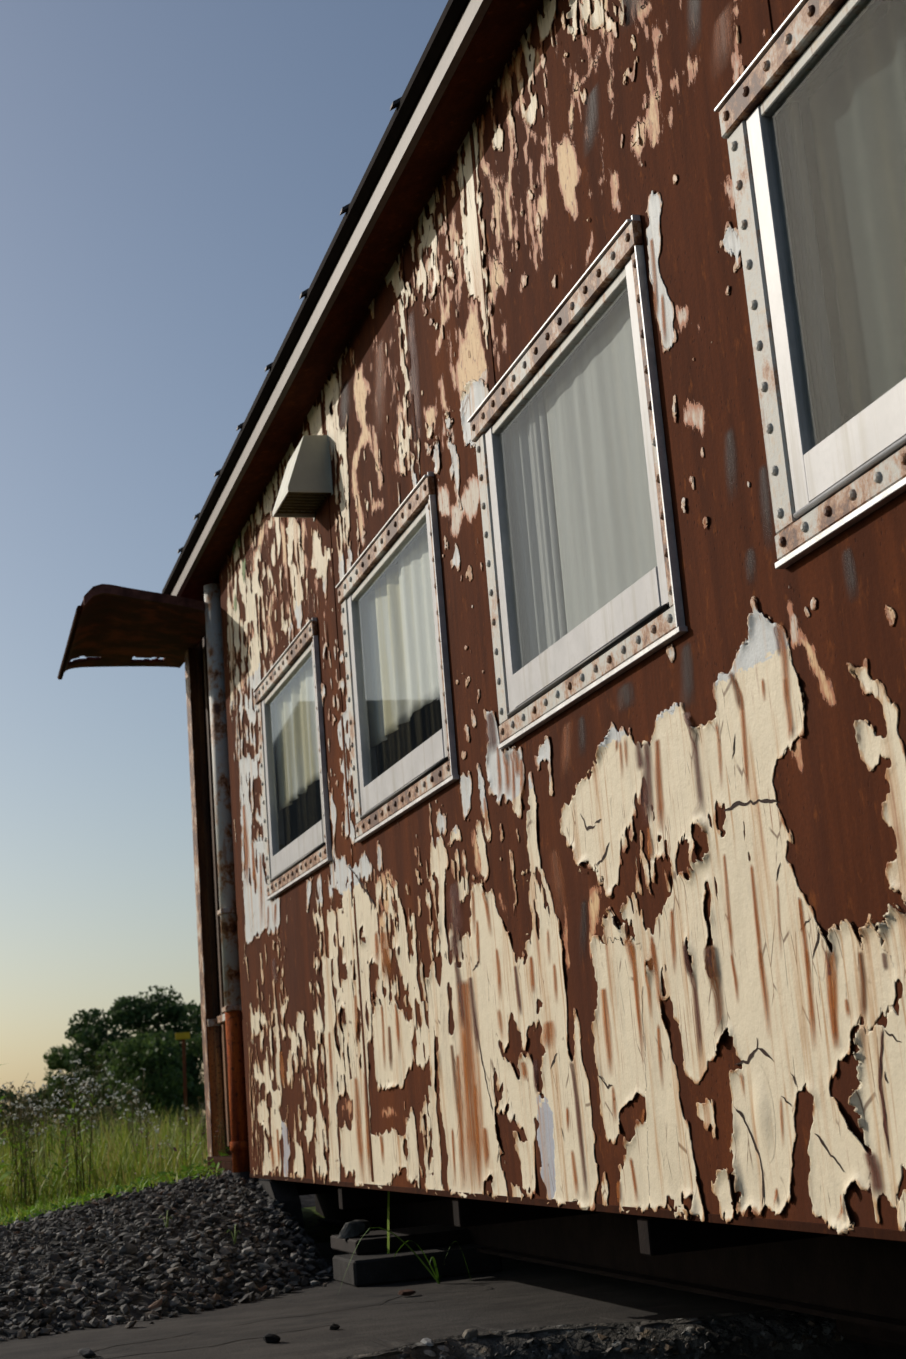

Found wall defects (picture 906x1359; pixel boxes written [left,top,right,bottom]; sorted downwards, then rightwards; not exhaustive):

peeling [227,0,906,1235]
crack [580,814,609,866]
corrosion [616,740,663,856]
crack [724,799,779,811]
corrosion [450,883,490,1173]
corrosion [566,1063,586,1188]
corrosion [624,937,659,1039]
corrosion [671,855,737,1046]
corrosion [750,866,768,1013]
corrosion [798,899,866,1040]
corrosion [865,1153,882,1192]
corrosion [879,1032,888,1141]